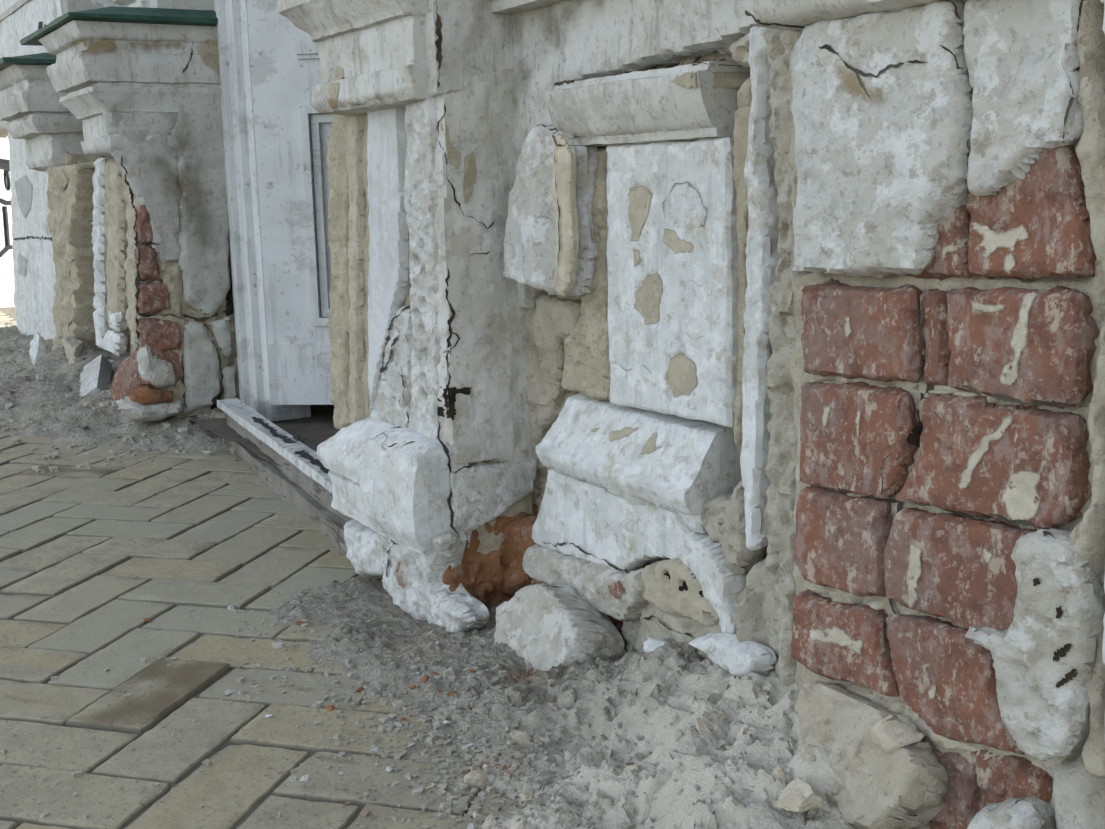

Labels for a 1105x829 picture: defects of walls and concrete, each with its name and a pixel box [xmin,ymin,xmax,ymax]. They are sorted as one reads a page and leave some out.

crack [745,0,973,101]
crack [1077,0,1086,33]
crack [1062,57,1074,143]
crack [121,156,234,398]
crack [373,0,495,538]
peeling [628,186,652,268]
peeling [634,273,663,325]
peeling [972,301,1004,312]
peeling [1004,254,1015,275]
crack [180,355,188,407]
peeling [666,353,697,397]
spalling [502,514,537,599]